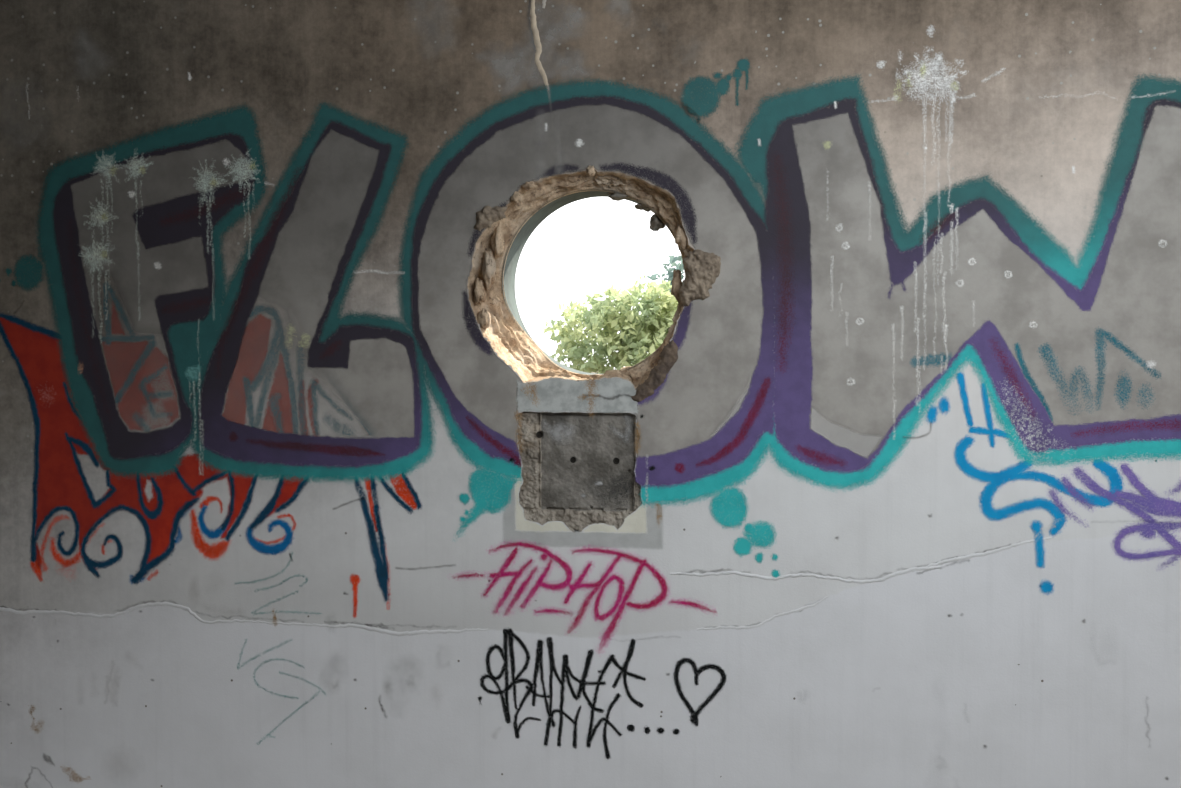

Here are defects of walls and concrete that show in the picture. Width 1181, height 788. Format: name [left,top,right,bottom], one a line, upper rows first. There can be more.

crack [529,0,549,91]
spalling [467,165,721,533]